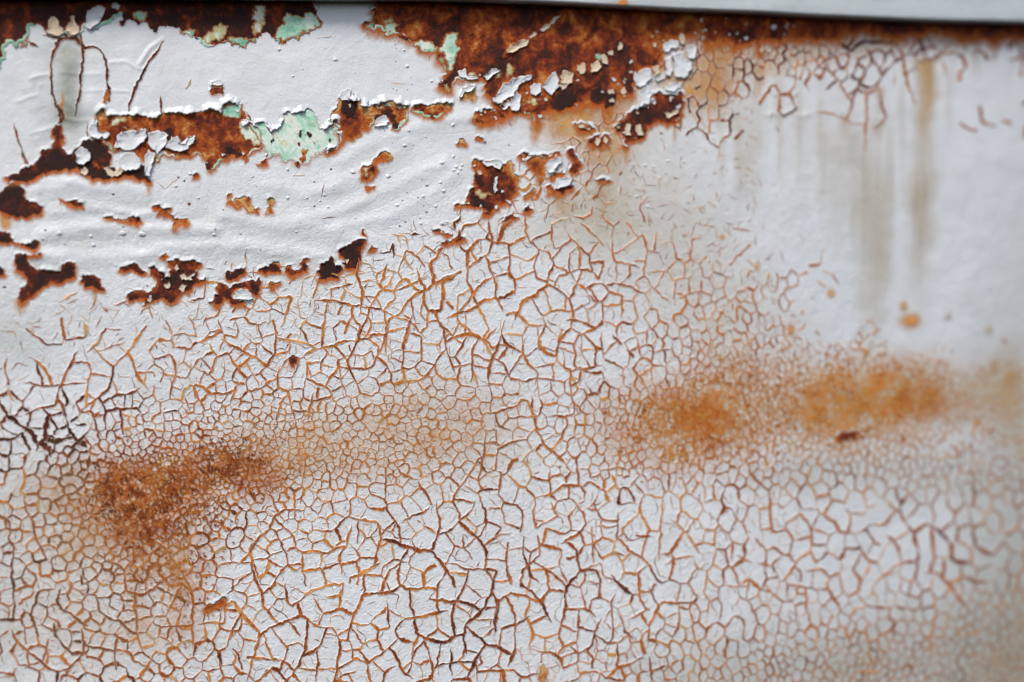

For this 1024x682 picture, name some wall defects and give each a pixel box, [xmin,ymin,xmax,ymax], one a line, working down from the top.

peeling [0,0,1024,309]
rust [531,105,627,166]
crack [552,116,622,187]
crack [590,105,631,155]
rust [667,47,765,107]
crack [649,34,1024,187]
crack [0,150,1024,682]
rust [604,340,965,482]
rust [74,397,506,623]